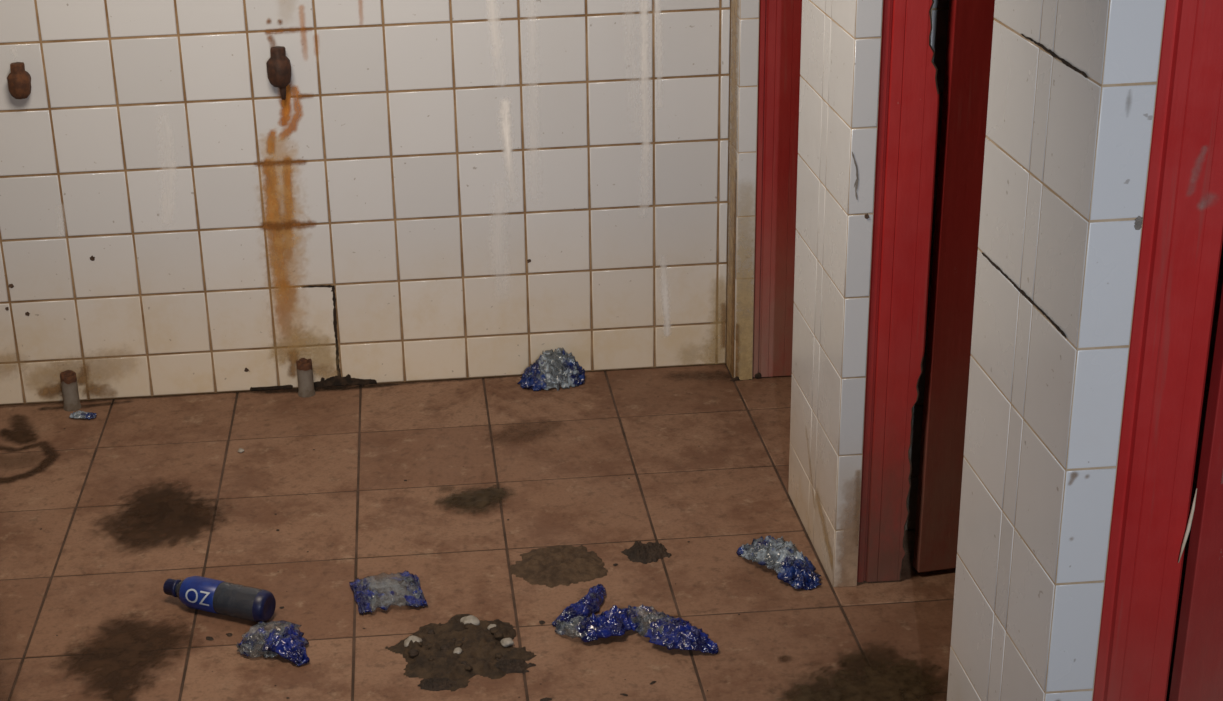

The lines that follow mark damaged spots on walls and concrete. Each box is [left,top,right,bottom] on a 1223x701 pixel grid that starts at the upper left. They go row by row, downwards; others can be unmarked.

rust [257,84,315,312]
leakage [39,374,64,410]
leakage [313,368,413,391]